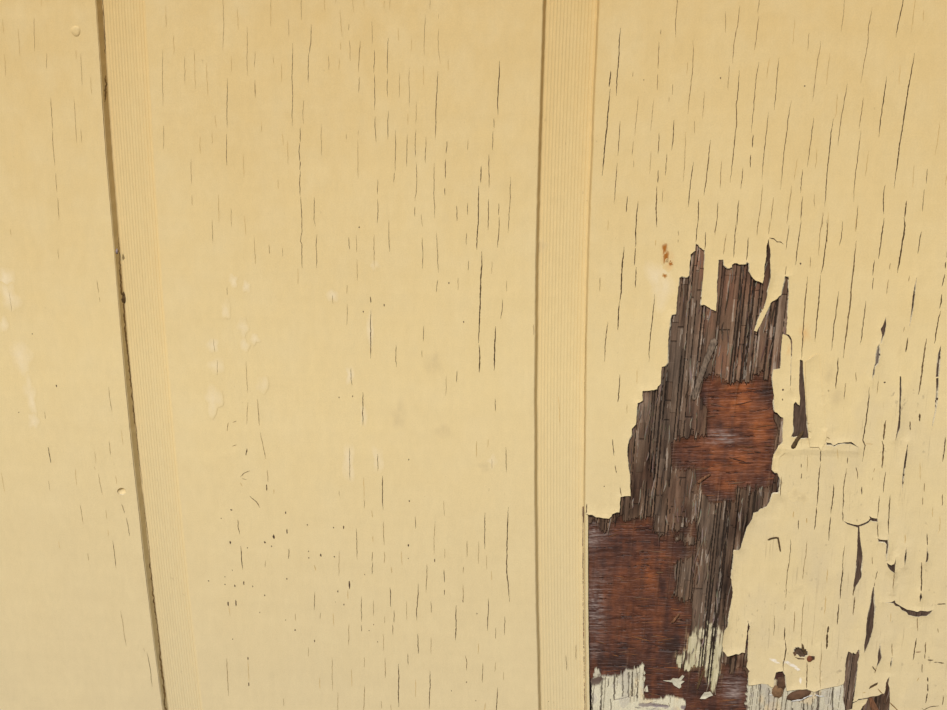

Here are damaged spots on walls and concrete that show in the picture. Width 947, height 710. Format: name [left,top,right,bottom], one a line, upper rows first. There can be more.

crack [227,369,268,505]
crack [162,0,511,371]
crack [295,448,510,710]
corrosion [659,239,675,279]
peeling [582,240,890,710]
crack [584,0,947,710]